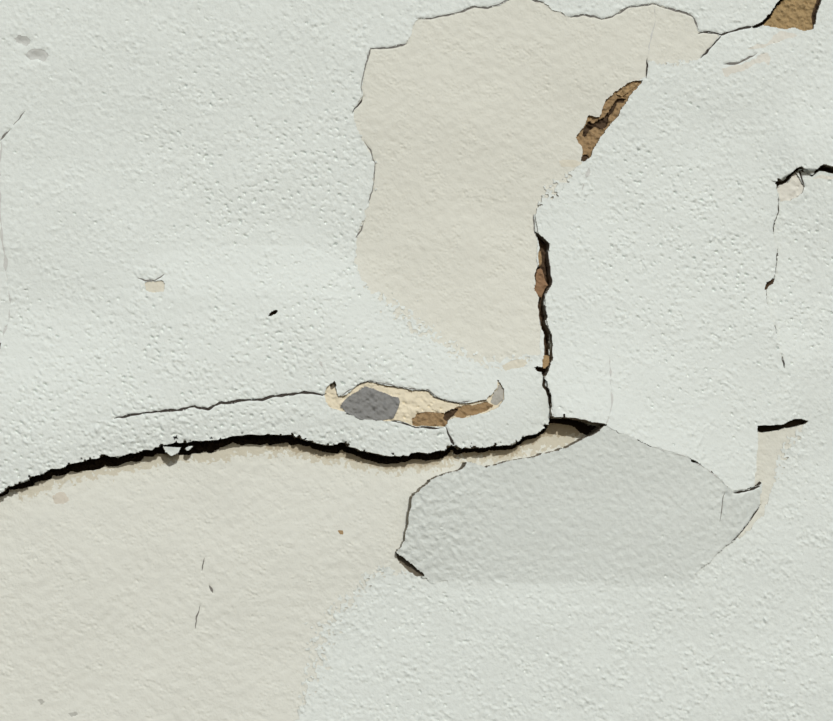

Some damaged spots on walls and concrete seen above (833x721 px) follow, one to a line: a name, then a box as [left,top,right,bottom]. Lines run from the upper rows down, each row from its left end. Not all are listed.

spalling [761,0,820,31]
crack [0,111,25,335]
crack [365,143,376,202]
peeling [324,0,719,427]
crack [766,166,833,305]
crack [0,215,613,497]
crack [757,419,806,433]
peeling [0,423,600,721]